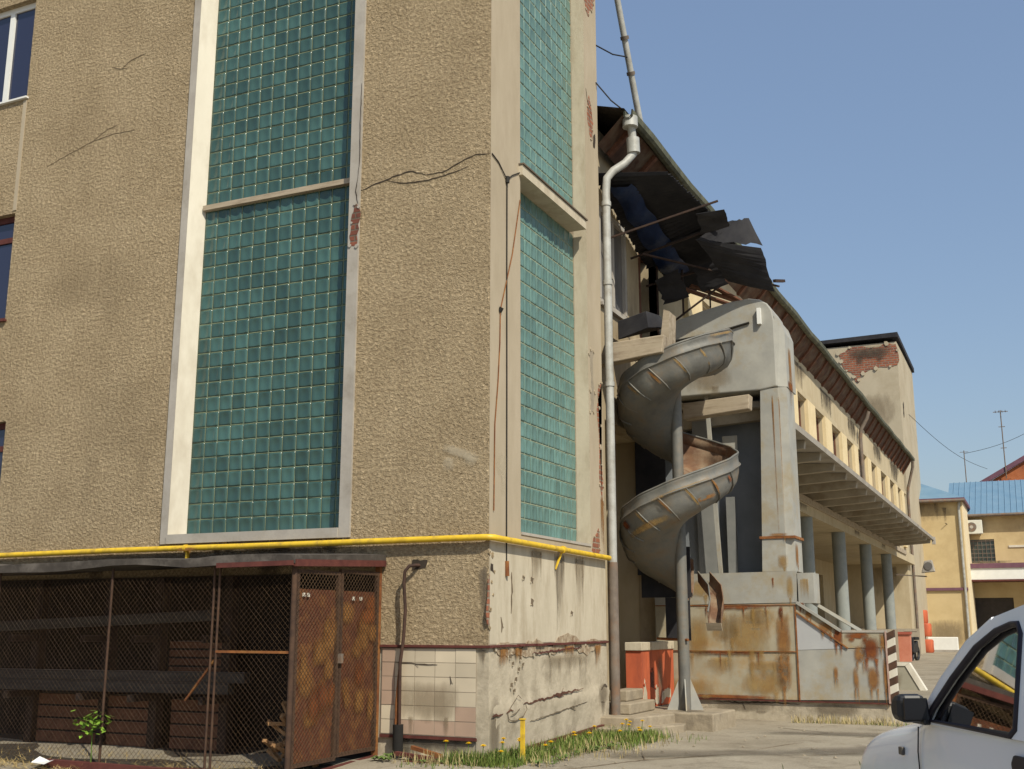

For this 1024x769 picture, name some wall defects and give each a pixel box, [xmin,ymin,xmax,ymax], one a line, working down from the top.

crack [47,125,132,167]
crack [355,85,488,203]
spalling [587,96,595,148]
spalling [348,202,361,248]
spalling [836,341,899,383]
rust [772,398,782,466]
spalling [486,551,600,693]
rust [691,548,890,705]